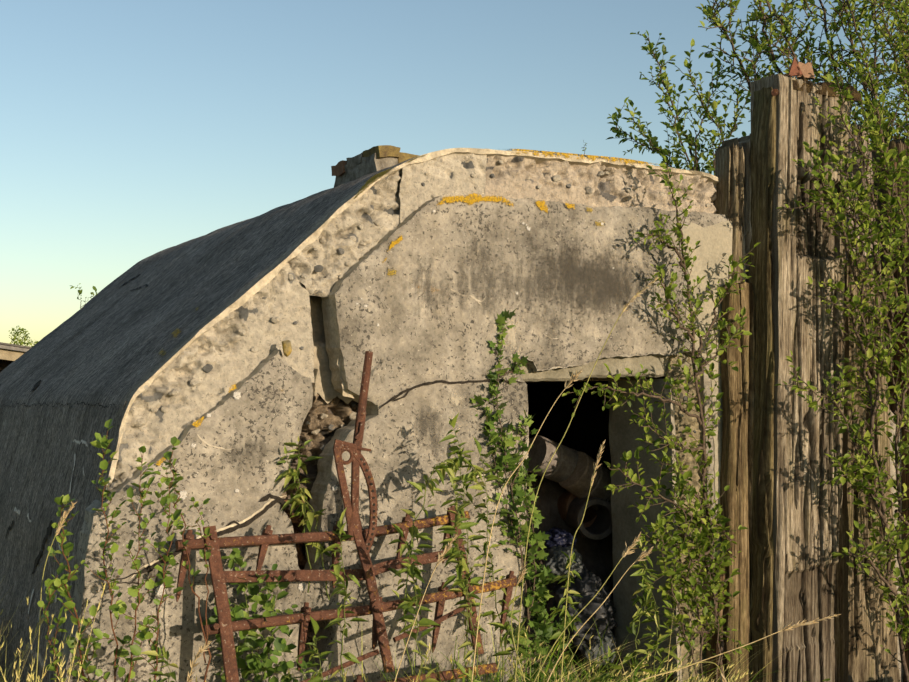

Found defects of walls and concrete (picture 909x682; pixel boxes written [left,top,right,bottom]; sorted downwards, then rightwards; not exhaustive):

spalling [108,153,746,682]
crack [377,375,524,411]
crack [116,494,296,585]